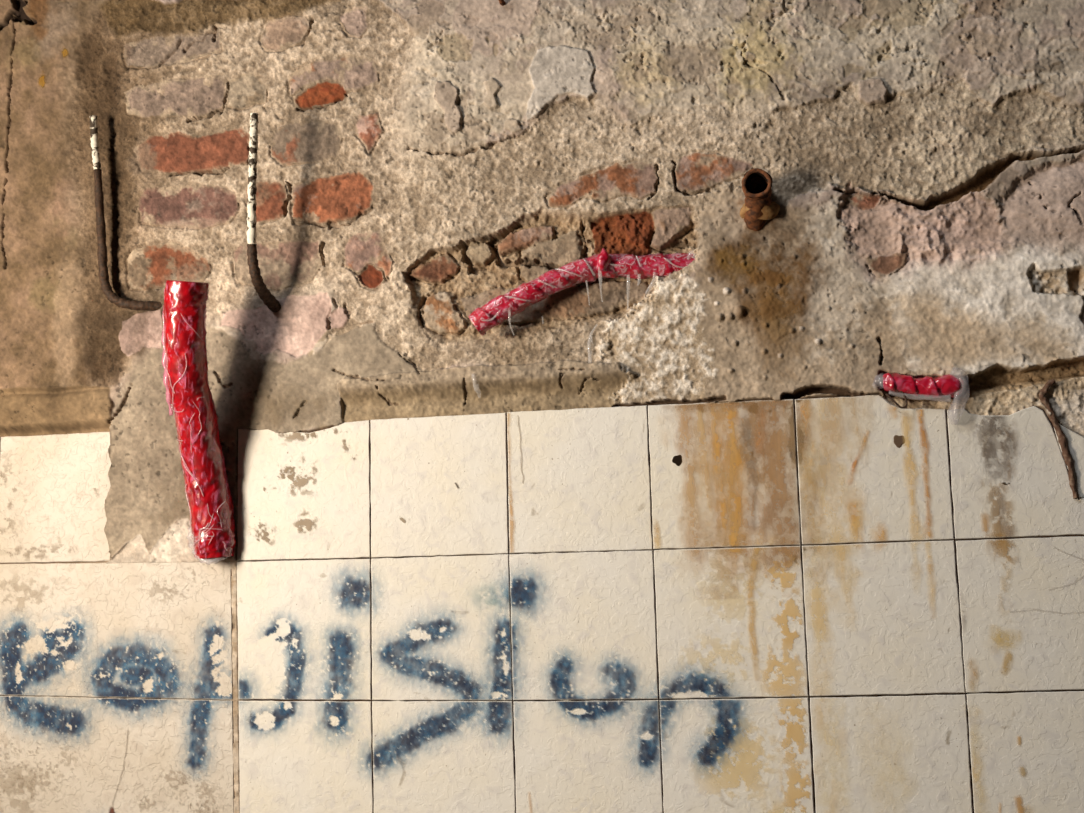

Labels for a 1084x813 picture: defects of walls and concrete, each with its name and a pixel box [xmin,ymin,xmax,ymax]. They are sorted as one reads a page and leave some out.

spalling [62,0,1084,388]
corrosion [710,230,815,341]
corrosion [679,401,808,564]
corrosion [904,410,929,498]